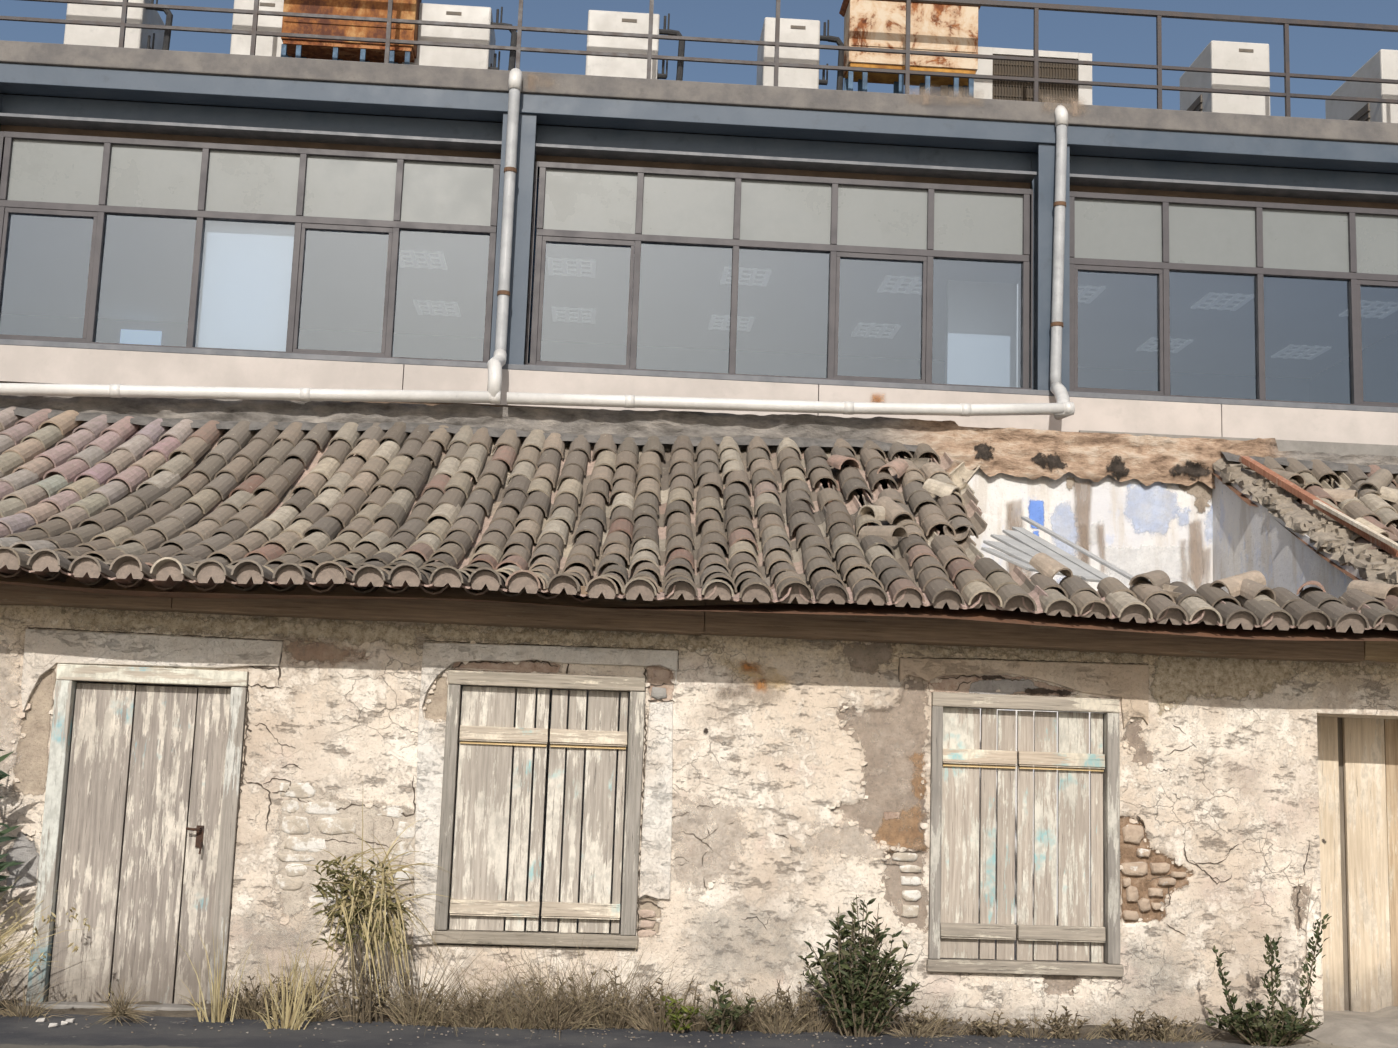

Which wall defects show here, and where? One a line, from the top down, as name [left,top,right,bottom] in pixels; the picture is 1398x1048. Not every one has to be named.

peeling [62,608,712,722]
spalling [834,640,903,678]
peeling [1151,656,1397,715]
crack [28,627,416,924]
spalling [805,674,1081,933]
spalling [1122,719,1154,769]
flaking render [636,896,666,937]
flaking render [1120,816,1194,923]
spalling [1289,845,1310,936]